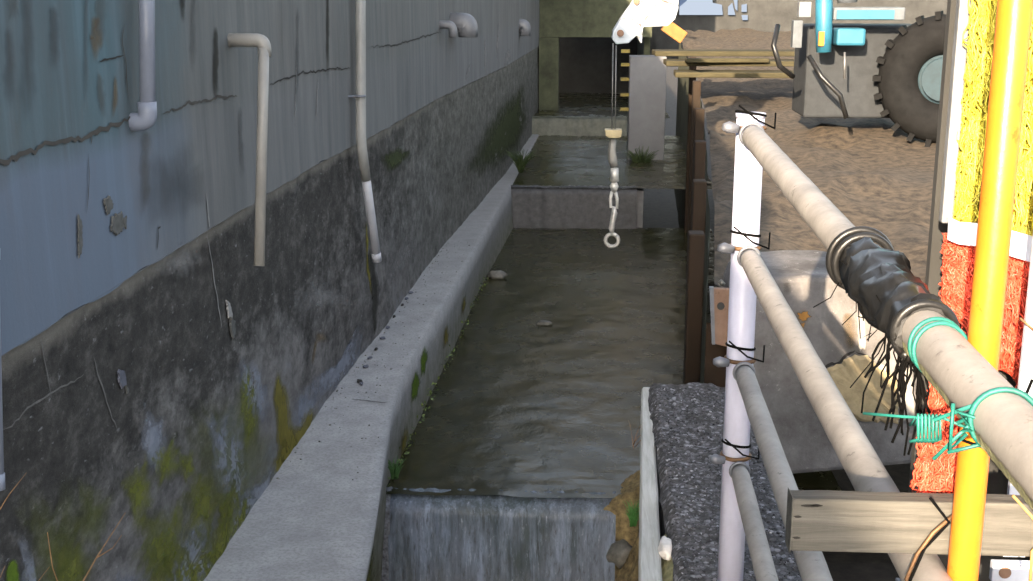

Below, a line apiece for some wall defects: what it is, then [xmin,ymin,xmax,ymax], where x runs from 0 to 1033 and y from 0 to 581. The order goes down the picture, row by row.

crack [100,24,128,91]
crack [271,67,350,85]
crack [371,32,441,48]
crack [164,95,236,114]
crack [0,116,130,206]
peeling [103,195,127,236]
spalling [117,369,129,393]
leakage [144,420,163,466]
leakage [210,335,359,529]
leakage [24,558,36,581]